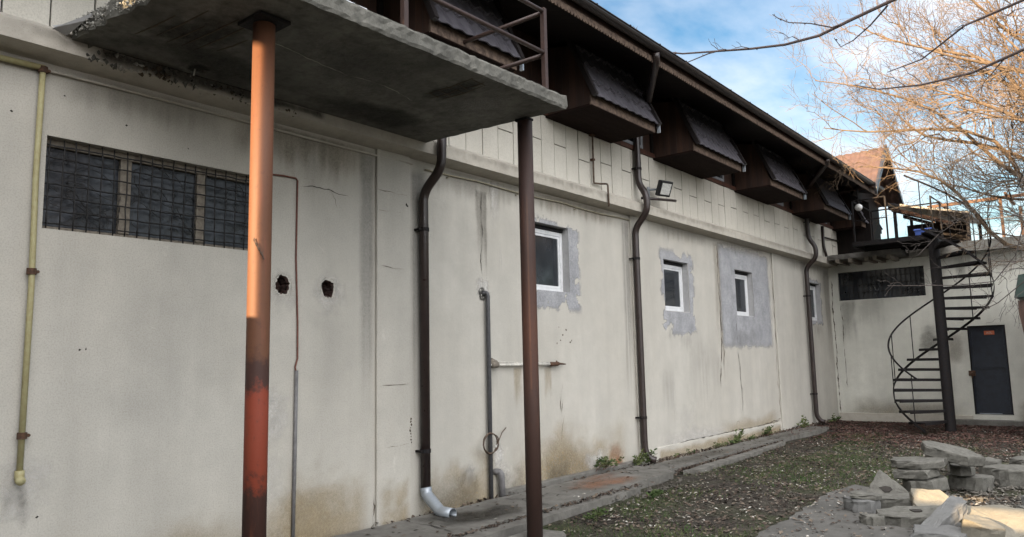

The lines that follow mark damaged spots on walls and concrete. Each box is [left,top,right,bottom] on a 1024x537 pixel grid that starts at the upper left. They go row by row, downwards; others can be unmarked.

spalling [52,0,144,36]
spalling [86,44,251,105]
spalling [271,268,296,302]
spalling [315,272,341,305]
leakage [541,446,616,481]